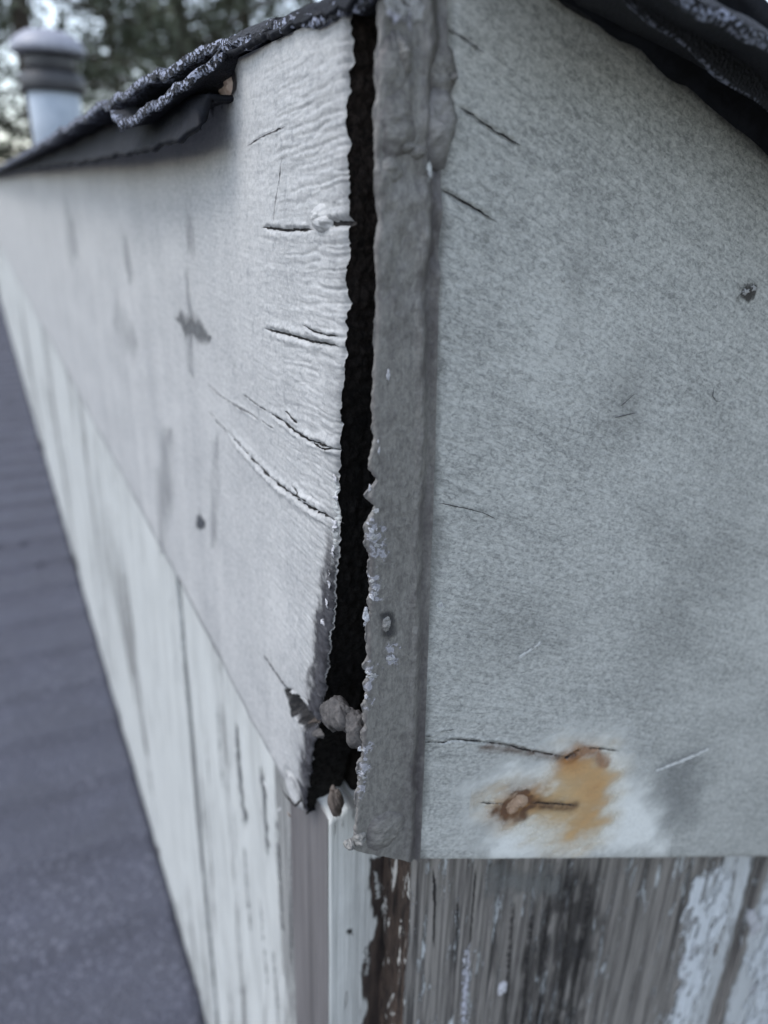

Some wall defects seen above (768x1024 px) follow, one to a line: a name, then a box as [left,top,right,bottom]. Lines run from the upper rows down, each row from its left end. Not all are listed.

crack [458,106,521,146]
crack [262,159,357,232]
crack [441,189,495,221]
crack [265,325,339,347]
crack [208,384,343,523]
peeling [357,742,372,792]
crack [427,729,617,759]
rust [460,726,672,859]
peeling [460,949,470,1023]
peeling [668,866,732,1024]
peeling [741,902,768,1024]